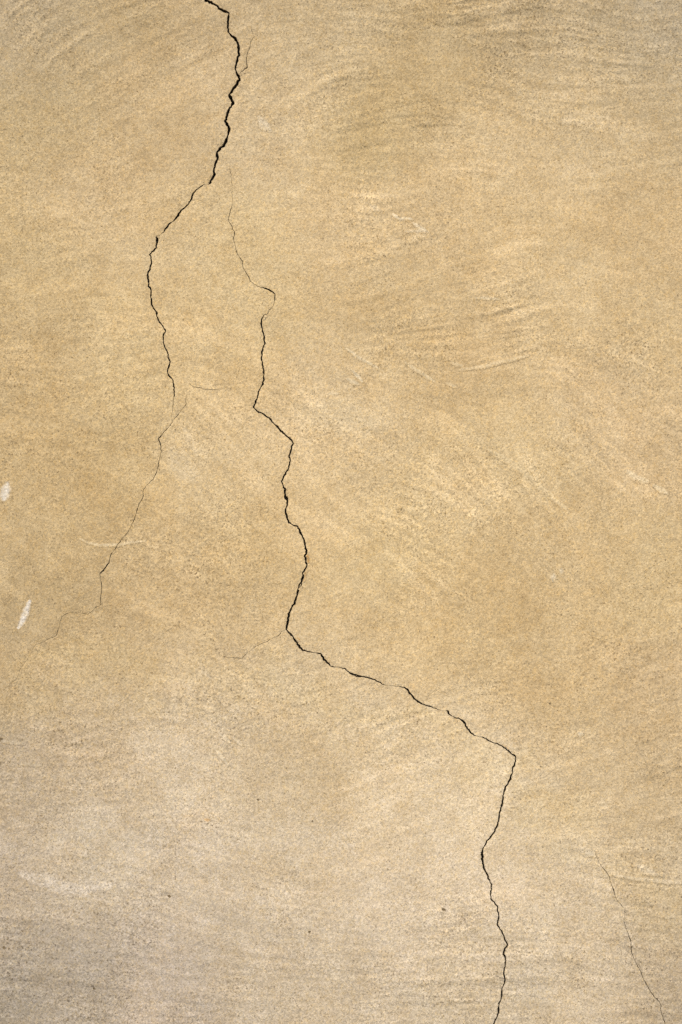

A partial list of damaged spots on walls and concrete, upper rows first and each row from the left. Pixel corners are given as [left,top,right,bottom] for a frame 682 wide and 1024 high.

crack [3,0,516,1024]